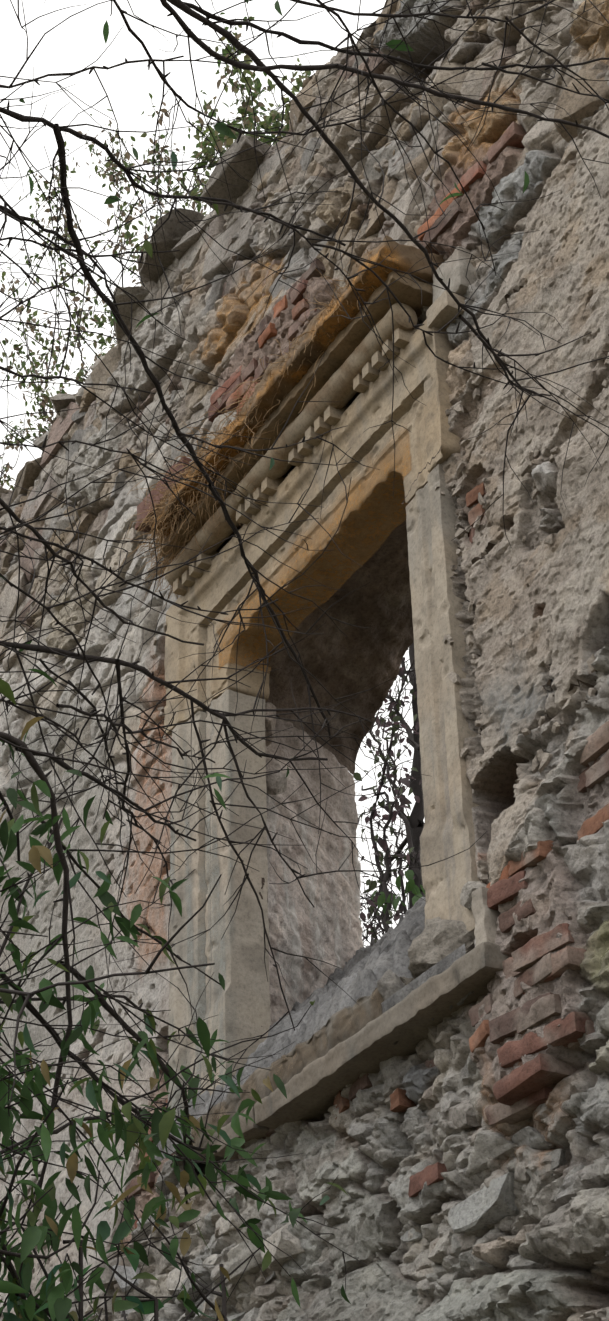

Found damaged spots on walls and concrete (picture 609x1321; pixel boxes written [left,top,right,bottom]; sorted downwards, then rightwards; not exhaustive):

flaking render [417,121,527,260]
flaking render [468,654,609,1129]